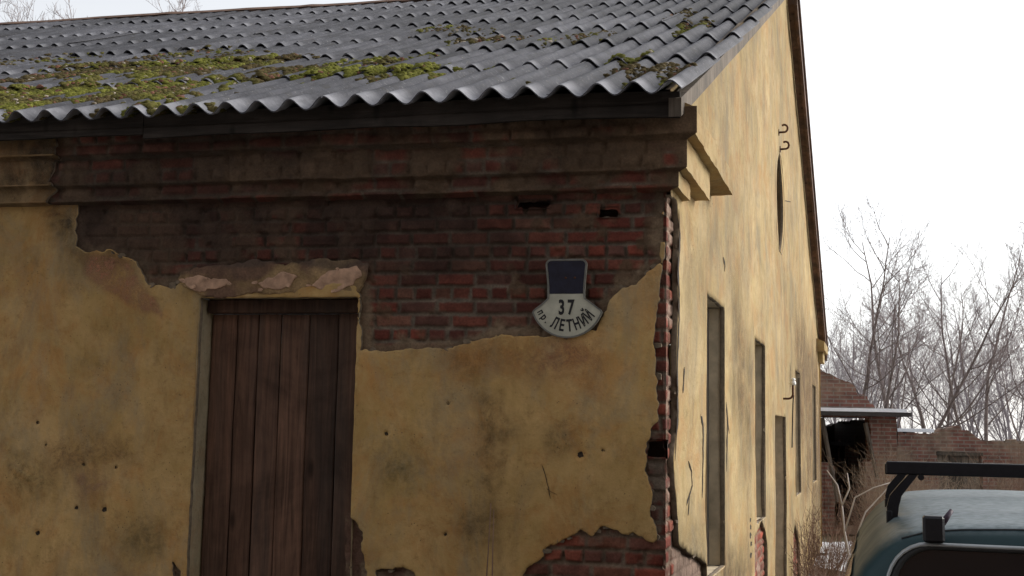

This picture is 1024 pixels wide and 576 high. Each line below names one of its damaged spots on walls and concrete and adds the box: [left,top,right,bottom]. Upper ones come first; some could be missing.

flaking render [48,106,702,576]
crack [675,215,730,515]